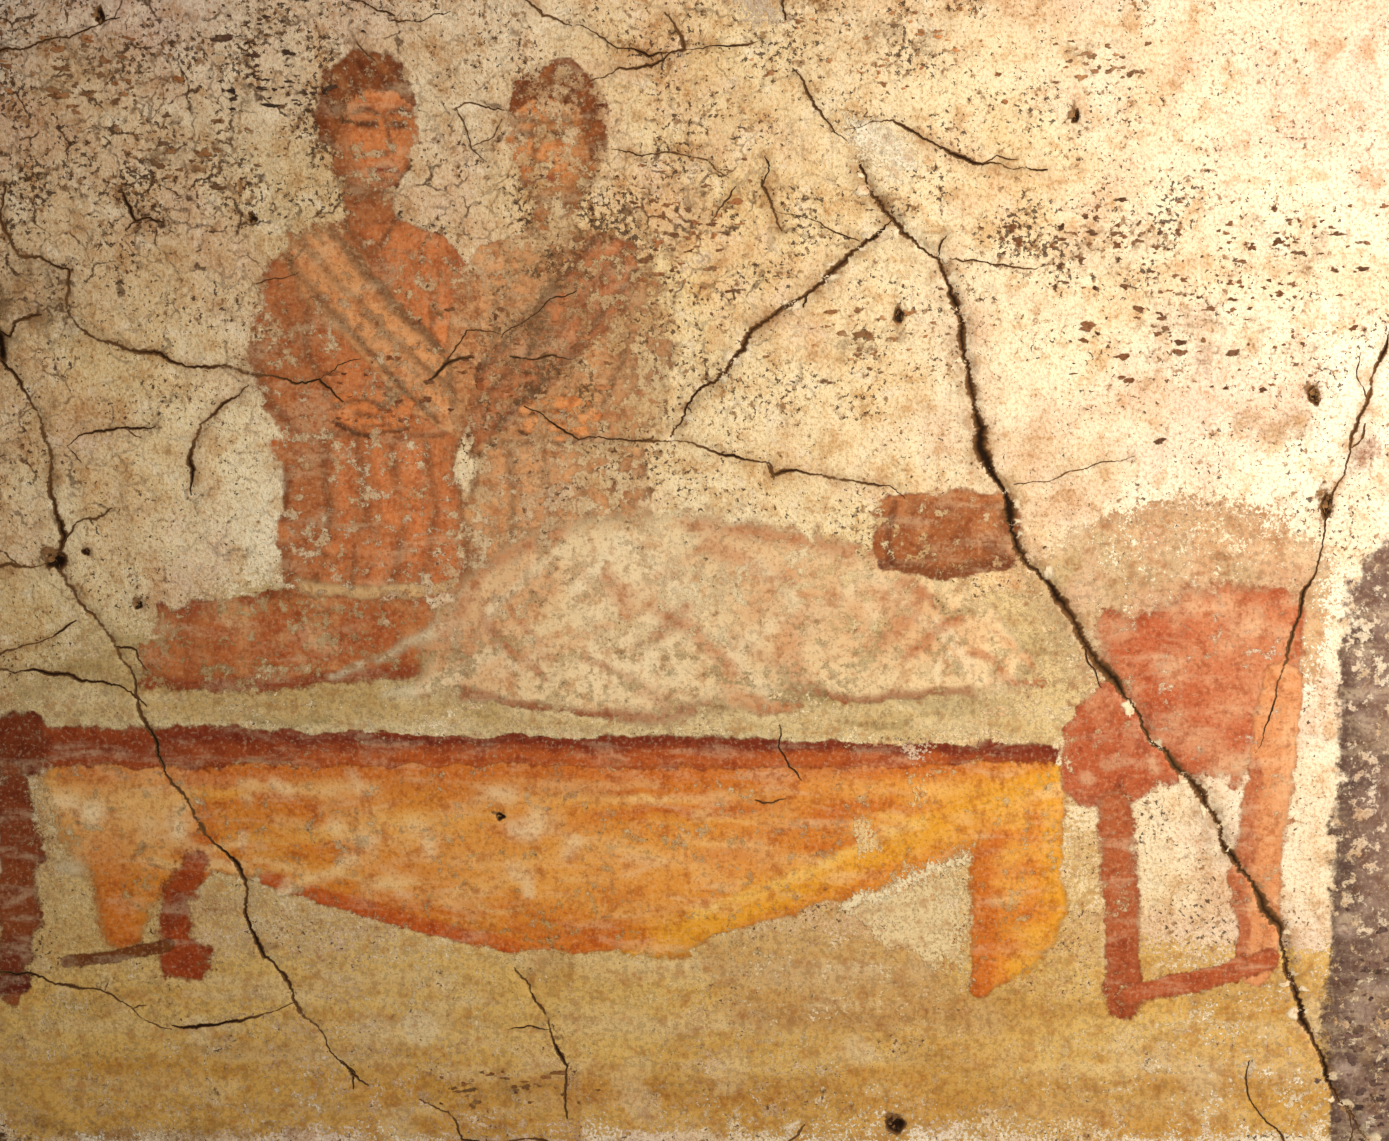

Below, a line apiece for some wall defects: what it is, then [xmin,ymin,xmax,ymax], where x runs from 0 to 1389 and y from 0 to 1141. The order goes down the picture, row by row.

crack [0,17,120,53]
crack [351,0,451,23]
crack [526,0,787,84]
crack [453,102,505,162]
crack [428,291,576,381]
crack [0,186,369,1089]
crack [524,68,1389,1141]
crack [419,967,569,1141]
peeling [1331,957,1389,1141]
spalling [75,1122,186,1141]